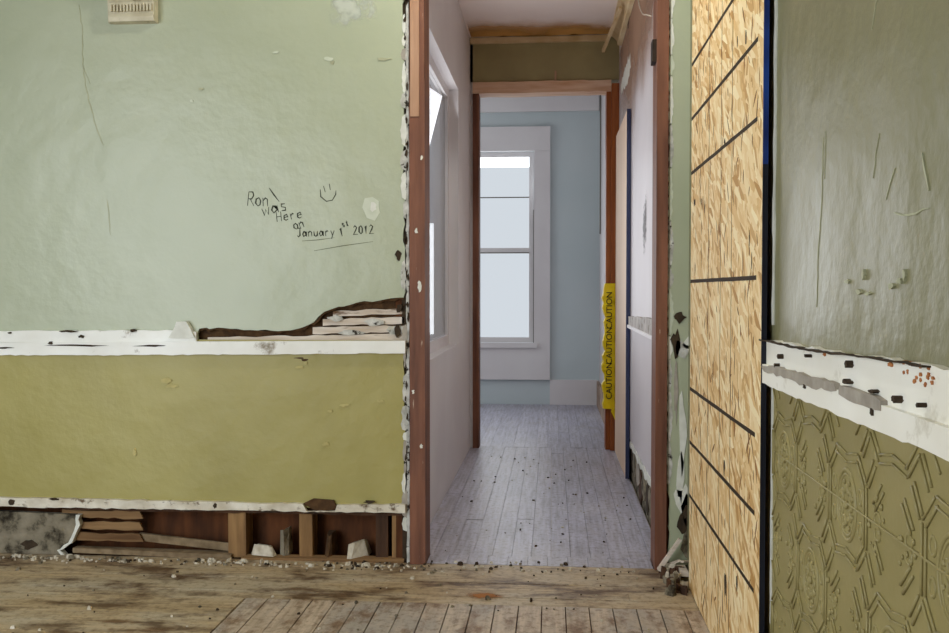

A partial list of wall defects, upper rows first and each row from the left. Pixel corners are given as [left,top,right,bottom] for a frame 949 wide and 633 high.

flaking render [200,260,422,334]
peeling [760,365,888,416]
spalling [0,324,414,563]